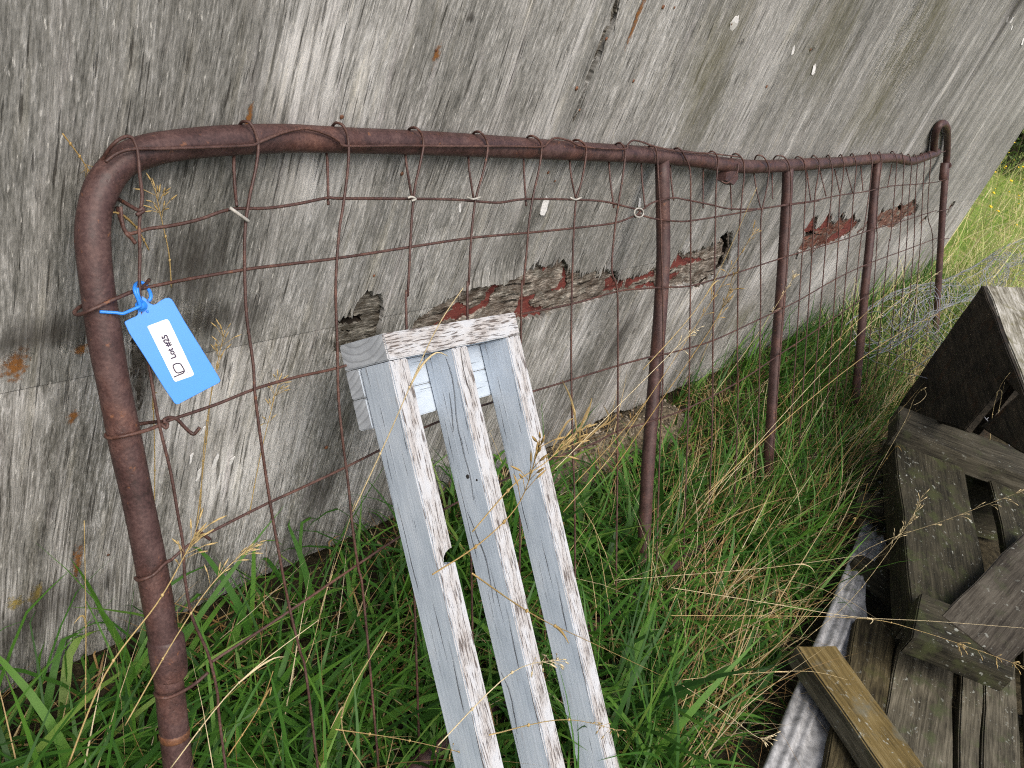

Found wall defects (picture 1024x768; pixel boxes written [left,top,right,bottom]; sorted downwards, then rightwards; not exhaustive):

crack [572,0,619,122]
rust [0,348,28,382]